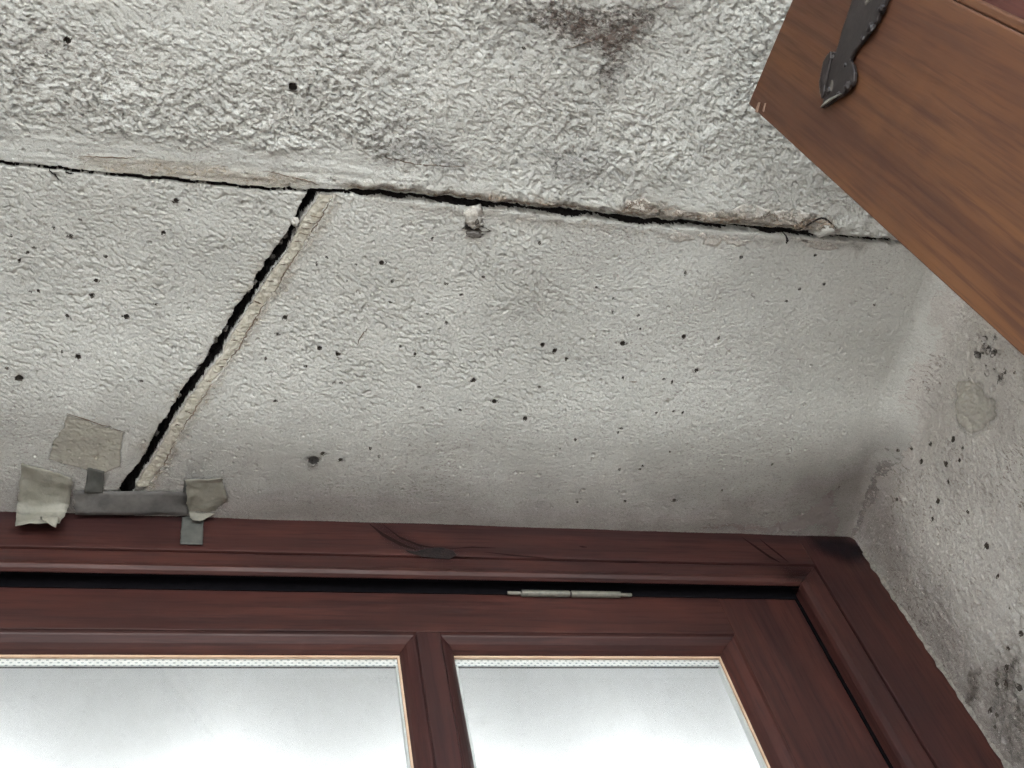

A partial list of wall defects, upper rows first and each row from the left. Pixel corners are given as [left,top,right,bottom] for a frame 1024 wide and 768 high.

crack [0,155,890,491]